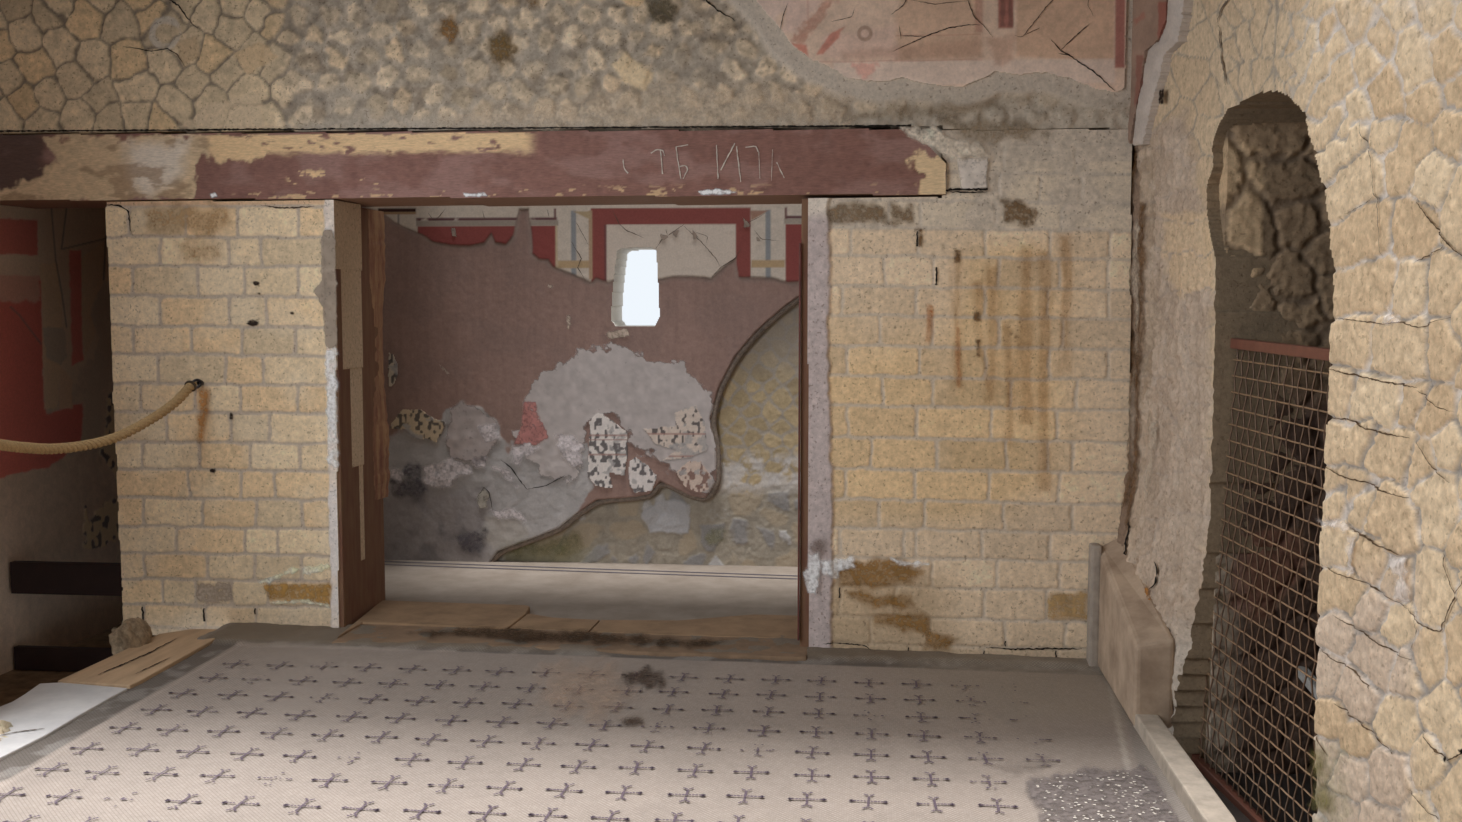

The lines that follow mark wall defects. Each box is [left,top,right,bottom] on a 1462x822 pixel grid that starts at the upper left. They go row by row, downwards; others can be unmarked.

crack [892,0,1115,91]
crack [1217,0,1228,85]
spalling [446,342,717,493]
water stain [804,554,952,649]